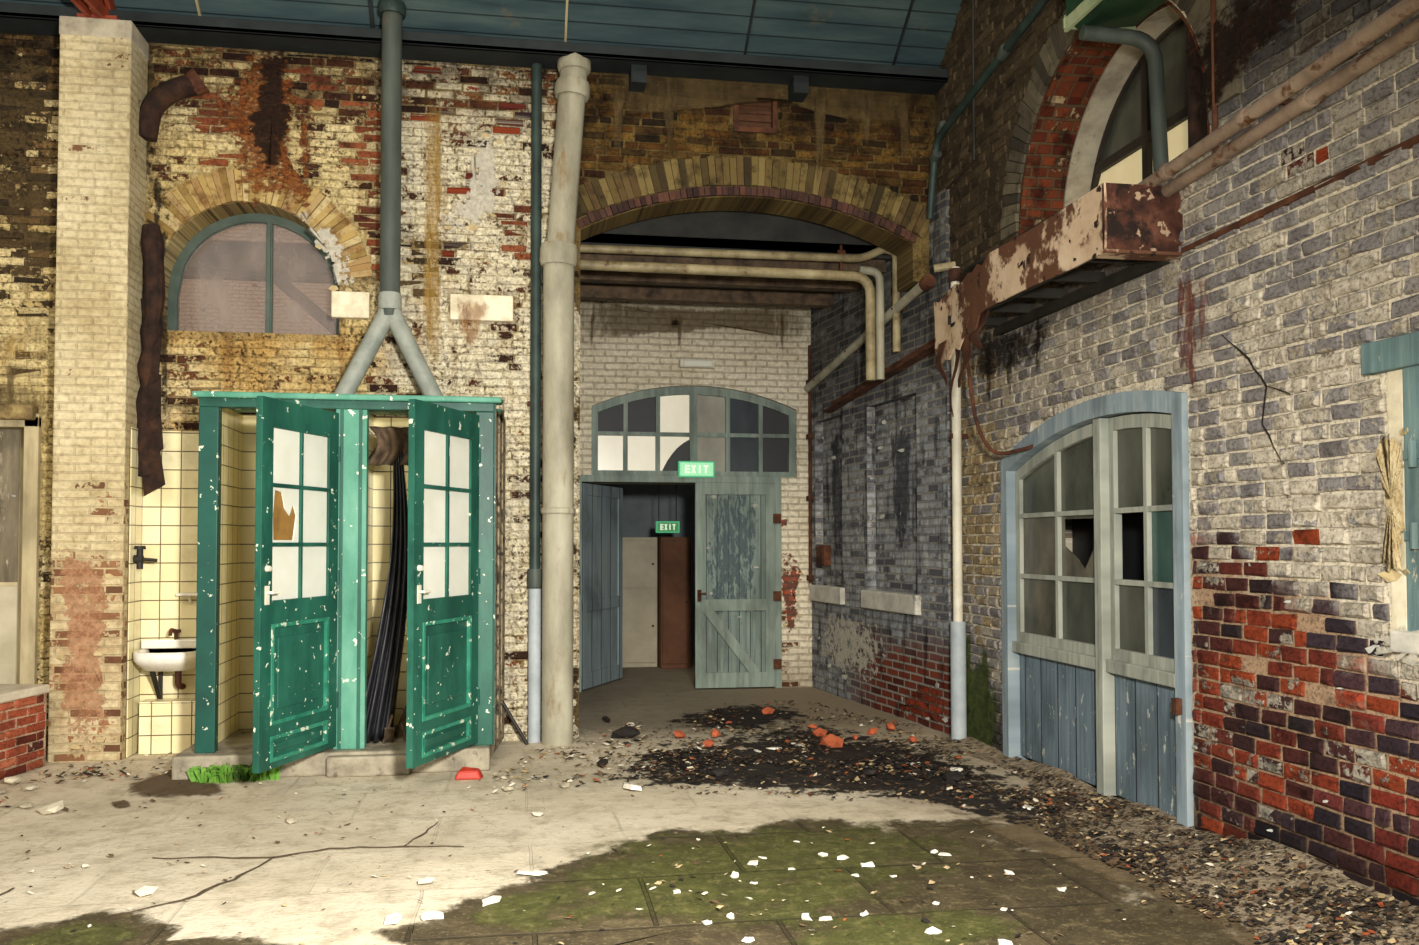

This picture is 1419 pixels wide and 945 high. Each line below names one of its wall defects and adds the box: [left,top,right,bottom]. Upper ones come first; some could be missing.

spalling [189,93,252,135]
spalling [199,151,247,167]
spalling [283,65,381,182]
peeling [293,199,380,292]
damp [972,320,1049,409]
crack [1221,334,1293,460]
spalling [57,546,113,750]
crack [108,822,464,916]